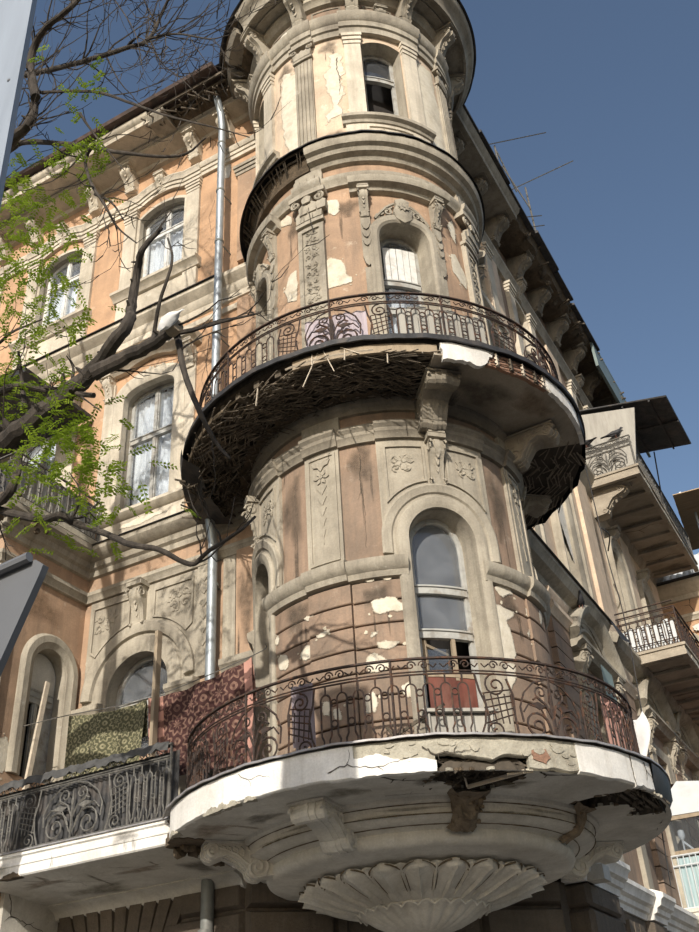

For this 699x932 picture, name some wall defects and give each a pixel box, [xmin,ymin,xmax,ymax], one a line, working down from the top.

peeling [323,53,349,125]
peeling [283,270,298,302]
peeling [327,257,357,289]
peeling [368,596,403,618]
peeling [275,626,331,671]
peeling [364,630,406,673]
peeling [495,586,528,692]
peeling [365,691,380,714]
crack [328,746,471,796]
spalling [422,738,576,791]
spalling [570,788,670,816]
crack [5,894,43,932]